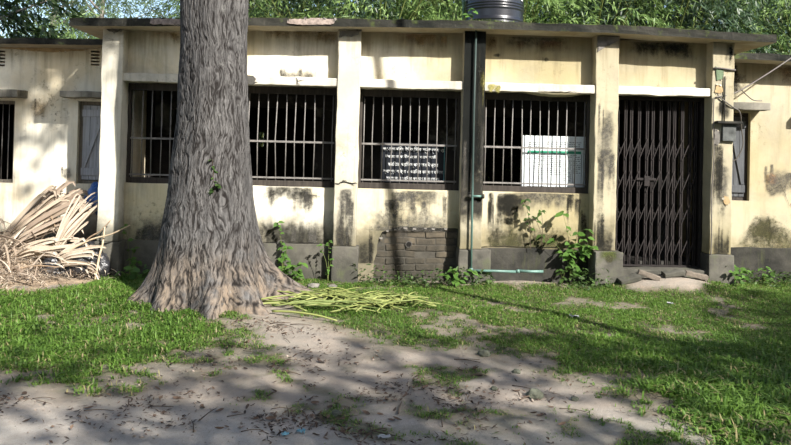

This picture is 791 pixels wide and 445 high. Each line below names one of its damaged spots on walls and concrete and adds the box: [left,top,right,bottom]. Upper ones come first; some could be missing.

water stain [460,31,615,262]
water stain [269,187,313,208]
water stain [261,225,326,244]
water stain [336,190,374,263]
water stain [378,191,447,232]
water stain [750,218,787,241]